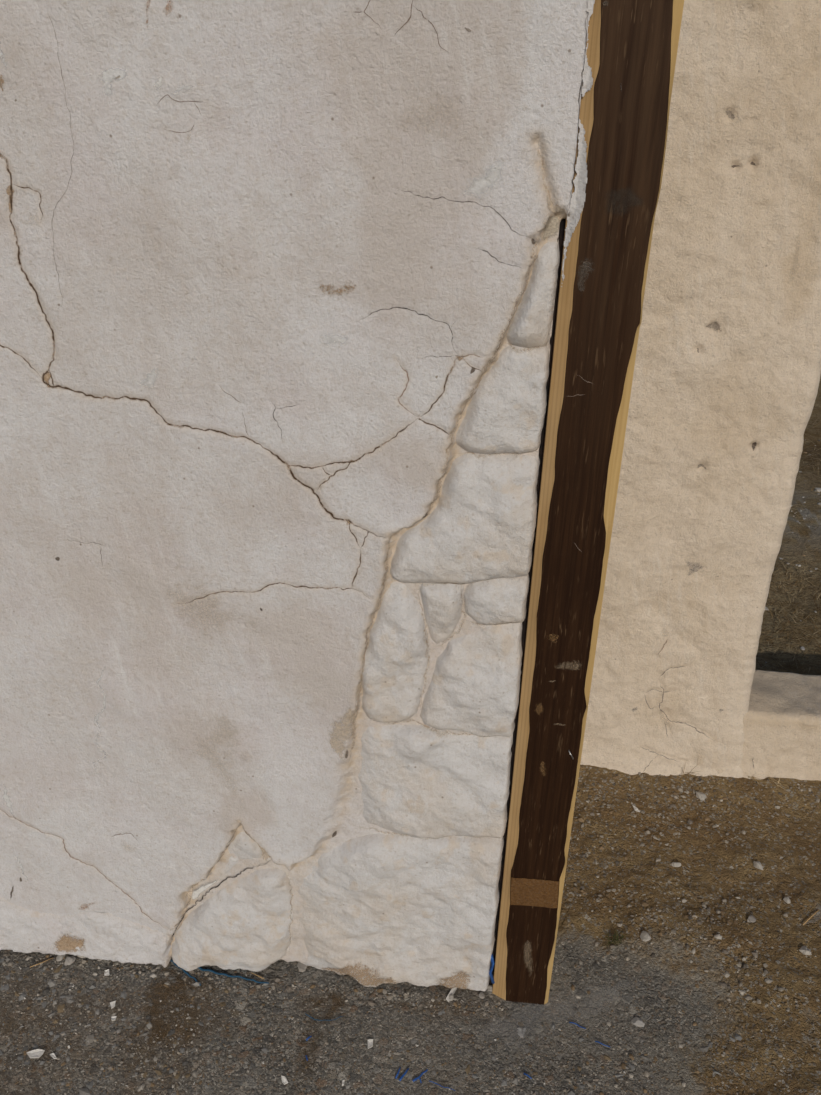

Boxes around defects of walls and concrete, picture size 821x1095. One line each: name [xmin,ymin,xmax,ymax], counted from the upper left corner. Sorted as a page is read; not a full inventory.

peeling [582,0,595,97]
crack [405,191,520,235]
crack [0,21,480,604]